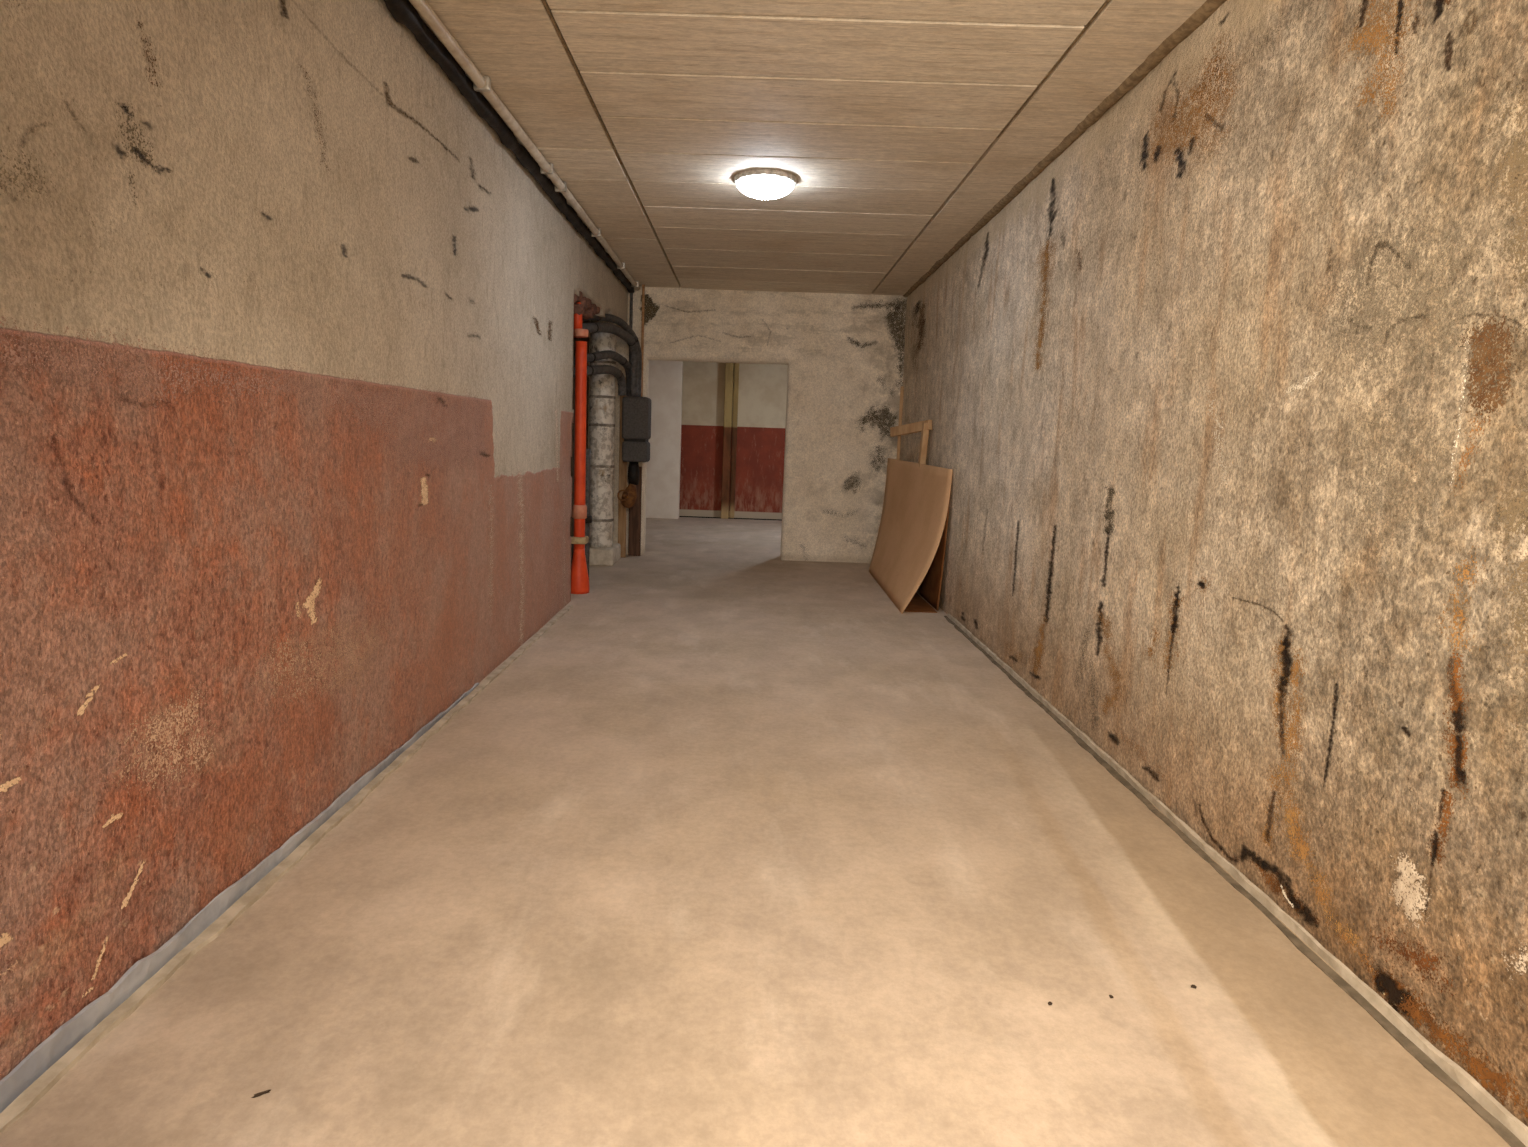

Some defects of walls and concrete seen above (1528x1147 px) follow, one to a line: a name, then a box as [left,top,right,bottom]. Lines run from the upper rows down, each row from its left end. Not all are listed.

crack [280,0,288,18]
damp [822,296,927,516]
damp [1285,58,1528,584]
damp [1483,416,1528,748]
rust [1275,648,1528,1118]